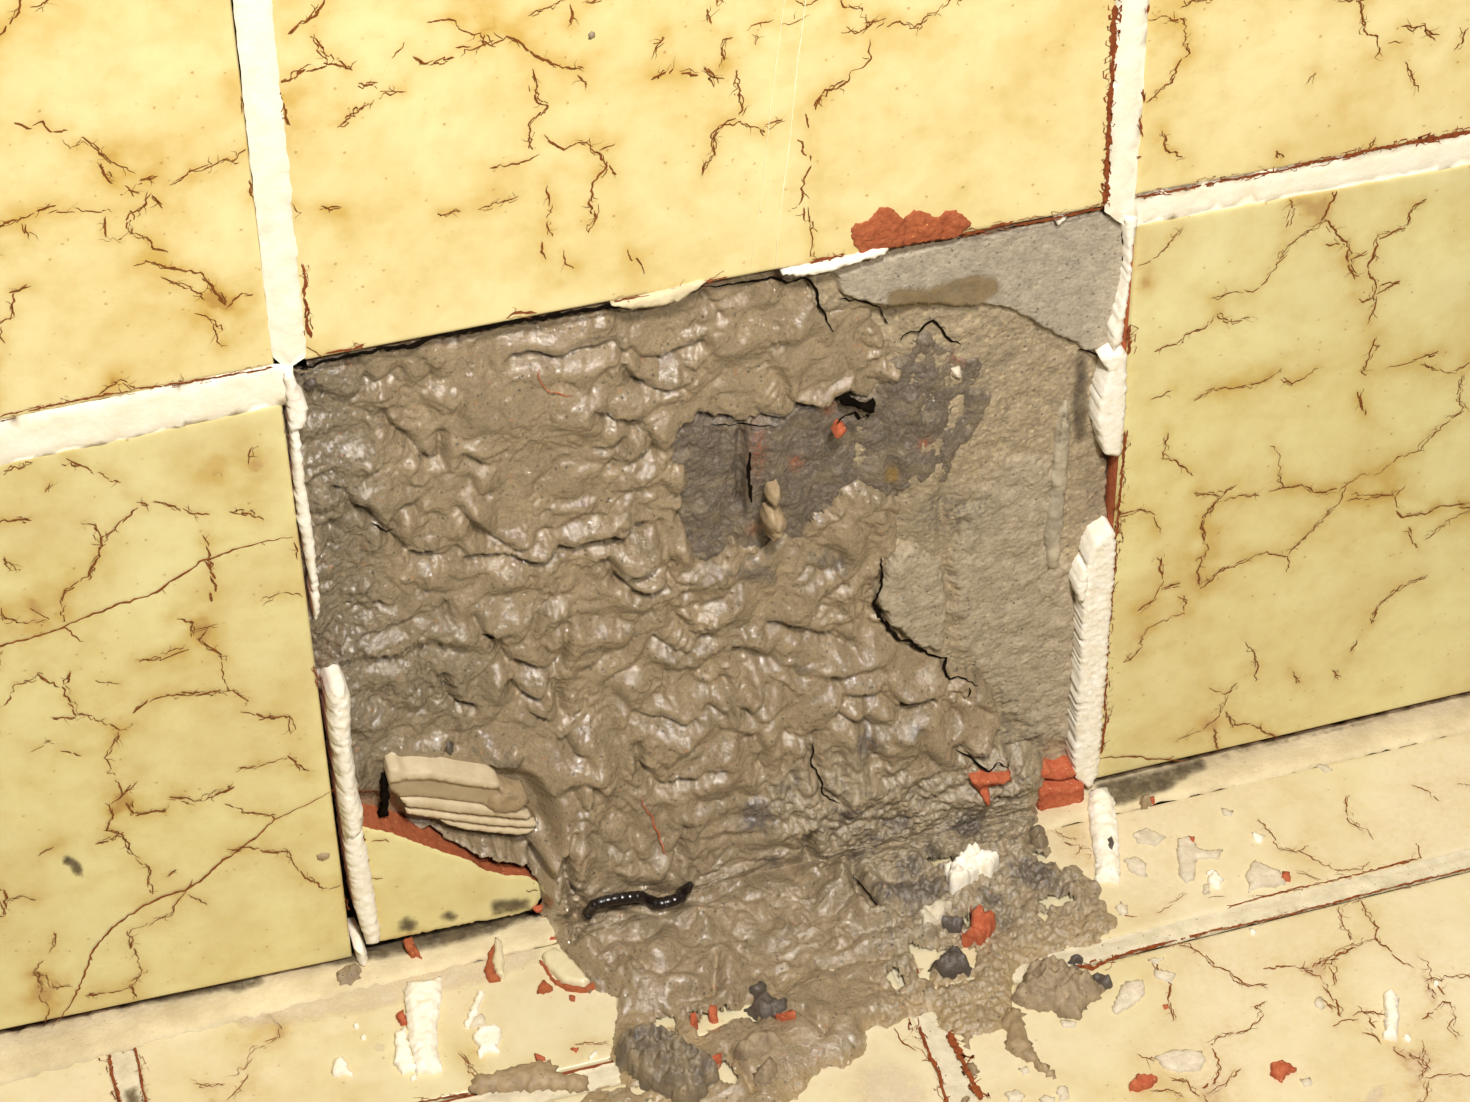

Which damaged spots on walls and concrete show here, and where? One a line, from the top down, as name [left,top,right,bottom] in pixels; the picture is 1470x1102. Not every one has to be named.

crack [841,298,960,344]
peeling [671,206,1123,811]
crack [0,537,291,647]
crack [872,558,978,697]
crack [956,749,1009,773]
crack [1100,754,1186,762]
crack [53,789,335,1025]
spalling [362,803,543,959]
peeling [916,899,952,925]